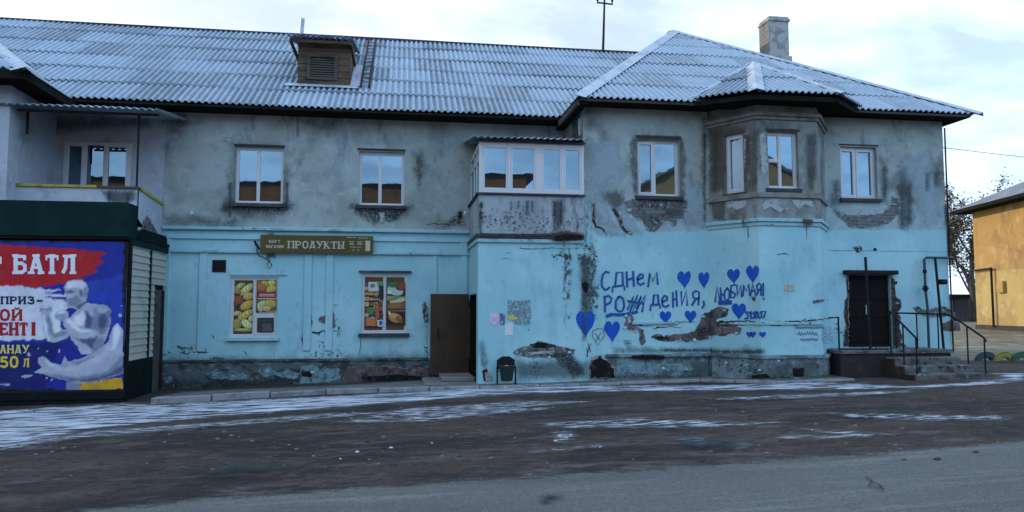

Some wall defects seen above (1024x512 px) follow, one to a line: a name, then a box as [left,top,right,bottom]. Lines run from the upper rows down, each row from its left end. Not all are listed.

spalling [482,138,688,236]
peeling [762,198,813,212]
spalling [833,197,900,228]
leakage [884,155,947,226]
leakage [479,201,597,320]
spalling [210,301,430,384]
spalling [513,341,575,359]
peeling [590,307,742,379]
spalling [786,274,850,347]